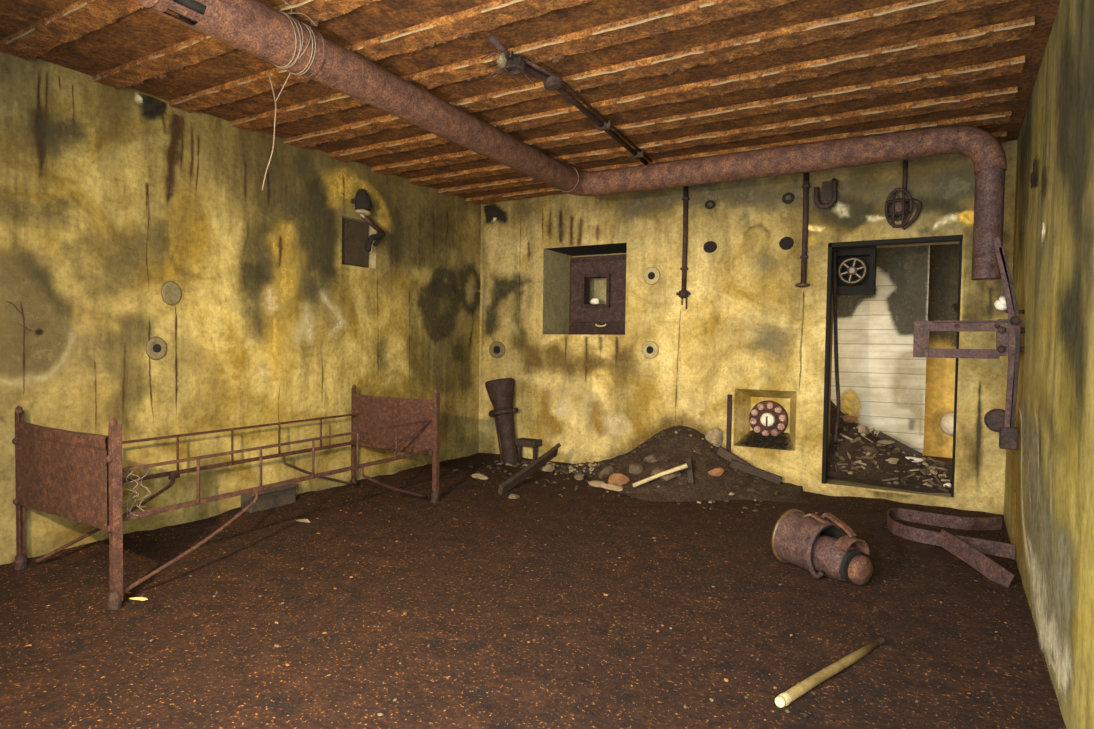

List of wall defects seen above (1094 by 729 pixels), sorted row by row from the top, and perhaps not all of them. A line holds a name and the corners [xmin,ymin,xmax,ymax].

damp [481,0,524,13]
damp [380,25,434,43]
damp [1055,0,1094,420]
damp [0,255,72,374]
damp [389,213,632,393]
damp [543,394,561,434]
damp [590,405,604,433]